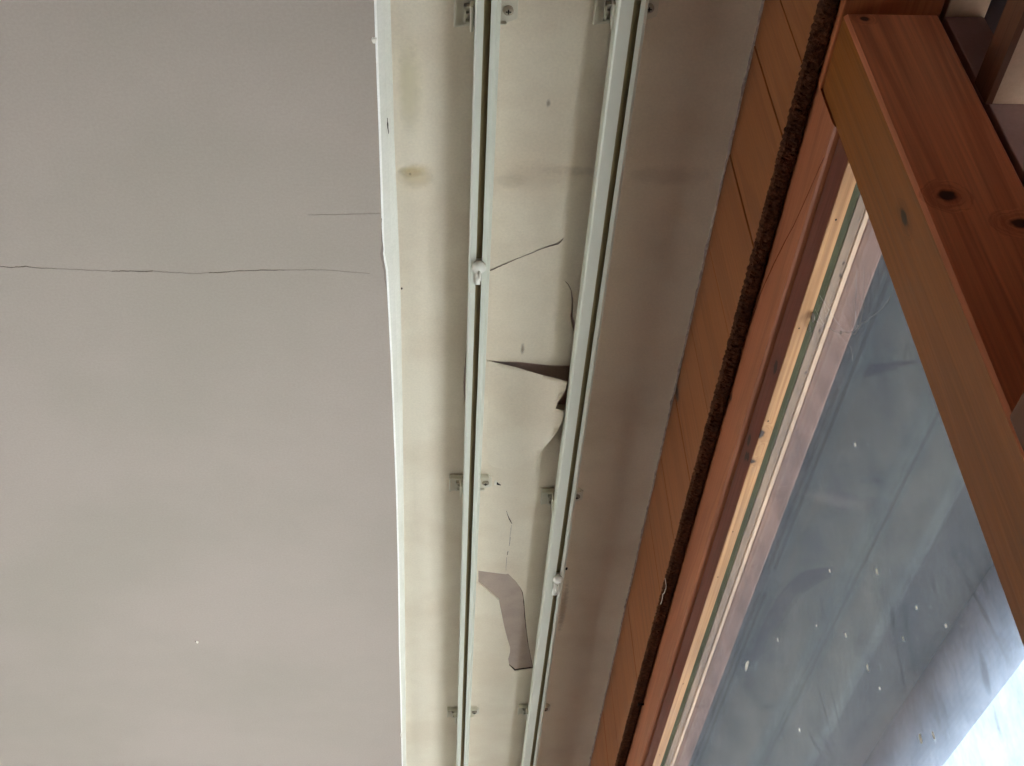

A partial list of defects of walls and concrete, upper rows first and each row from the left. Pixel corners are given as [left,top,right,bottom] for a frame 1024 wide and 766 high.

crack [0,266,370,274]
crack [490,239,563,271]
peeling [487,360,570,473]
peeling [478,571,533,670]